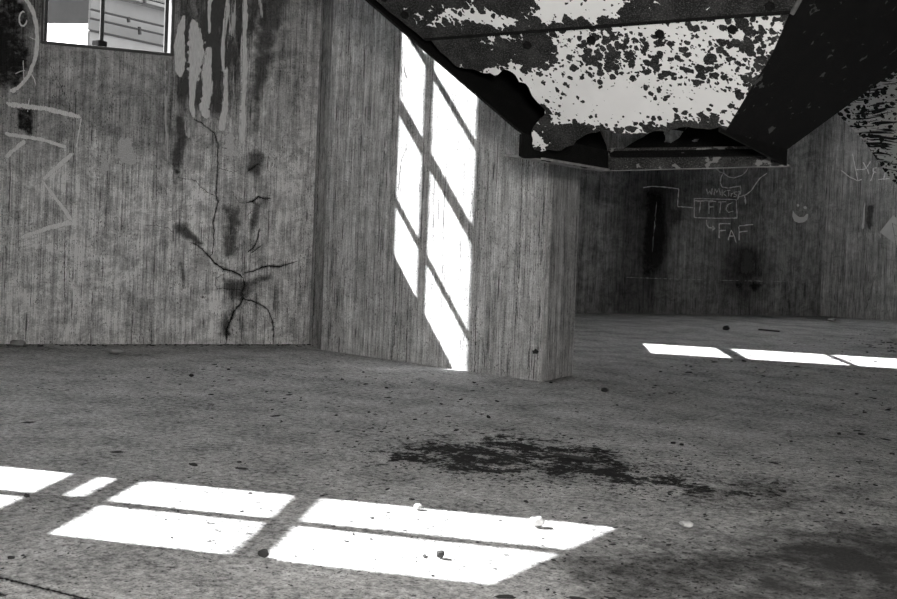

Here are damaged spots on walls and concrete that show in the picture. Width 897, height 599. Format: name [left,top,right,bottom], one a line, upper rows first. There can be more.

leakage [163,0,285,174]
crack [147,5,324,342]
crack [0,577,88,599]